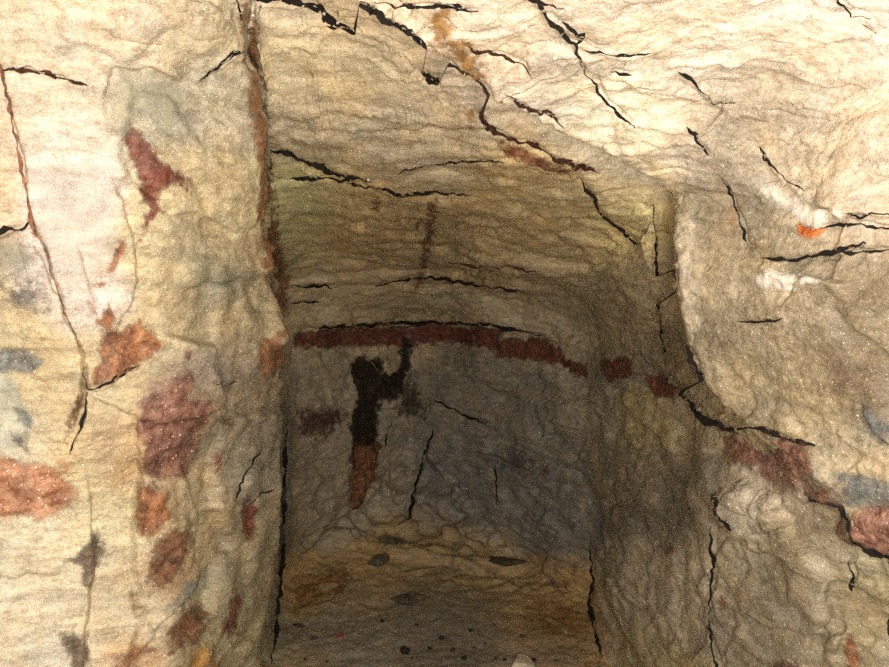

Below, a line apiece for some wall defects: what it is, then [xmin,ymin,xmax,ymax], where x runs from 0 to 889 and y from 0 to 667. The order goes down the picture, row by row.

crack [3,66,88,86]
crack [201,51,244,80]
crack [528,0,651,129]
crack [270,149,502,198]
crack [462,41,679,346]
crack [0,222,35,235]
crack [375,262,541,293]
crack [293,284,335,304]
crack [302,320,563,341]
crack [737,316,783,324]
crack [398,428,434,525]
crack [707,494,731,667]